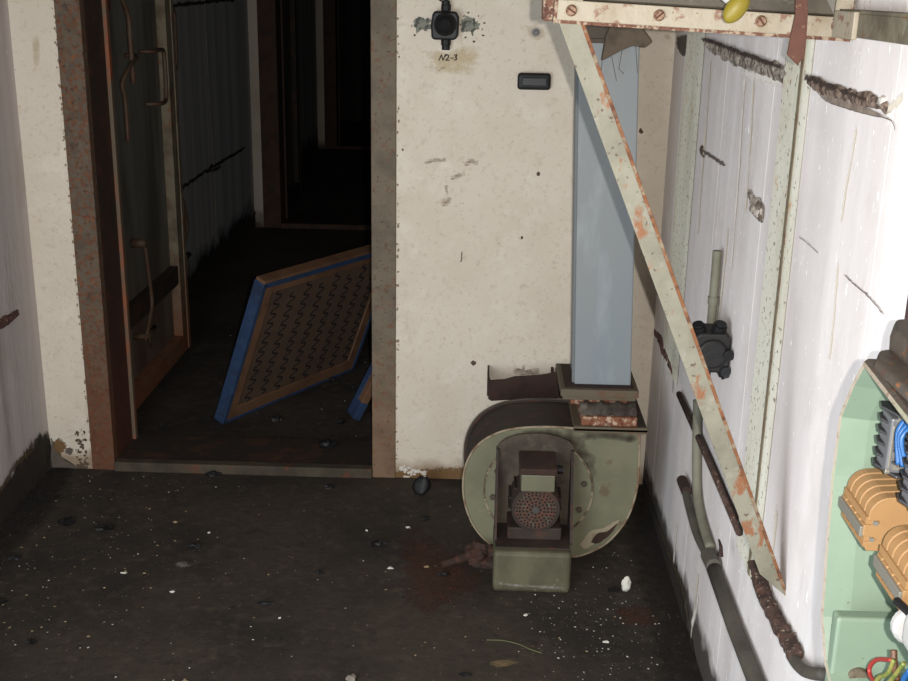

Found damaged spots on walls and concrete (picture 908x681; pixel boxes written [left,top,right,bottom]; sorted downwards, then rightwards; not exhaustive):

crack [173,0,234,8]
crack [183,147,245,189]
peeling [50,417,90,469]
damp [0,433,67,525]